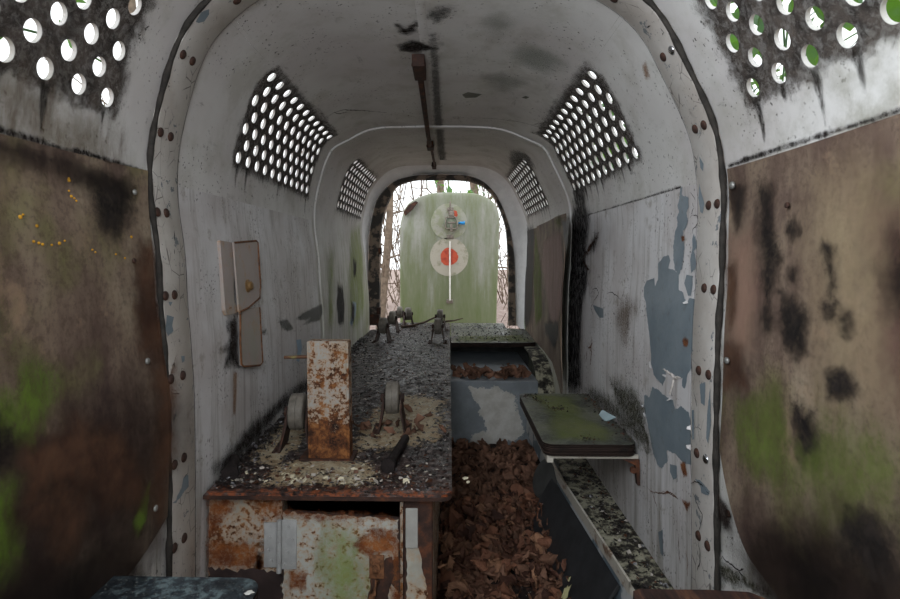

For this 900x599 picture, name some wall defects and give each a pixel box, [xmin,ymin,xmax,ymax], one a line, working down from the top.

leakage [691,0,900,168]
leakage [0,0,185,529]
corrosion [206,500,403,599]
leakage [506,61,681,464]
peeling [641,184,711,480]
leakage [716,494,732,534]
leakage [720,173,860,395]
leakage [787,364,864,472]